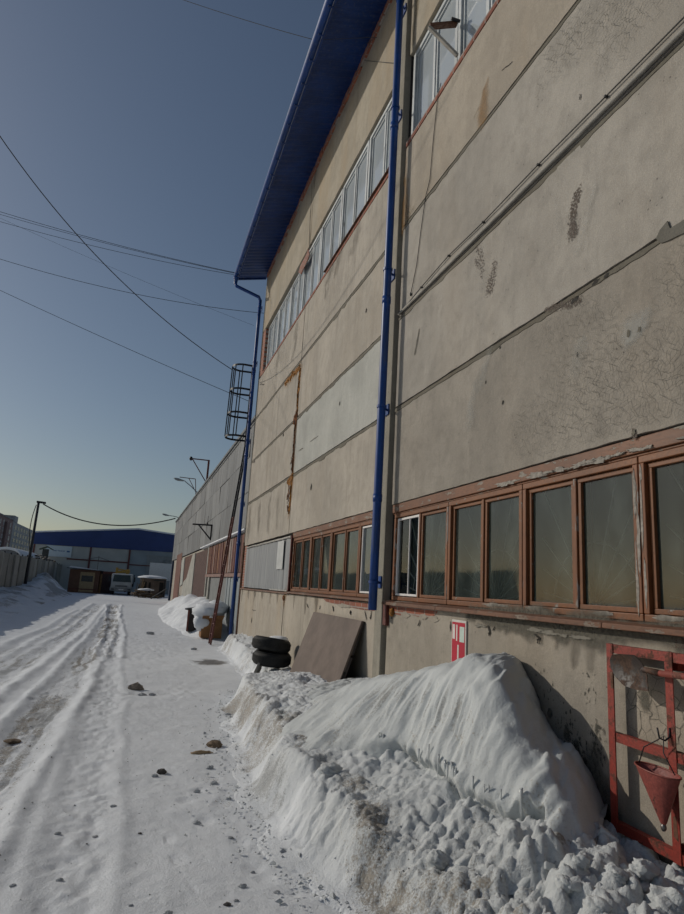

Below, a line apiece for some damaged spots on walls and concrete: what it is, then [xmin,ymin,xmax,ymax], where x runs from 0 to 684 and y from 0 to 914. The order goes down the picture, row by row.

spalling [566,184,582,243]
rust [284,365,301,514]
peeling [494,428,656,487]
damp [537,683,620,822]